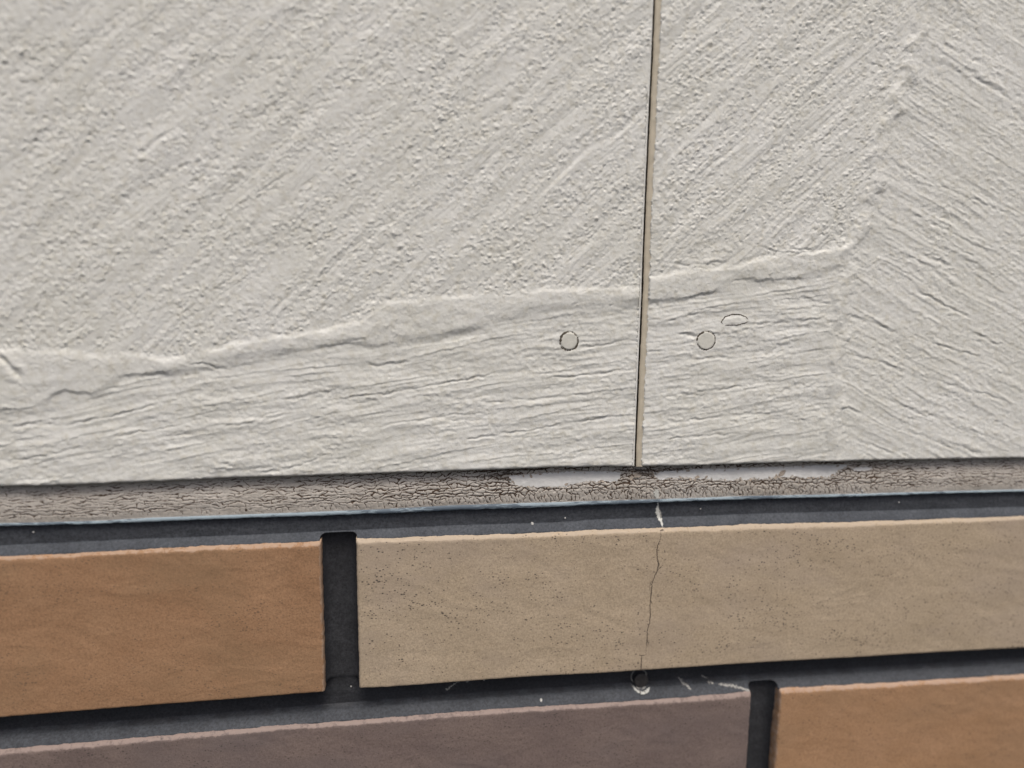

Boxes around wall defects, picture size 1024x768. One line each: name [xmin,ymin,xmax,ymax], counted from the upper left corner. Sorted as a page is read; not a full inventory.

crack [0,0,1024,520]
peeling [509,464,872,489]
crack [640,529,663,668]